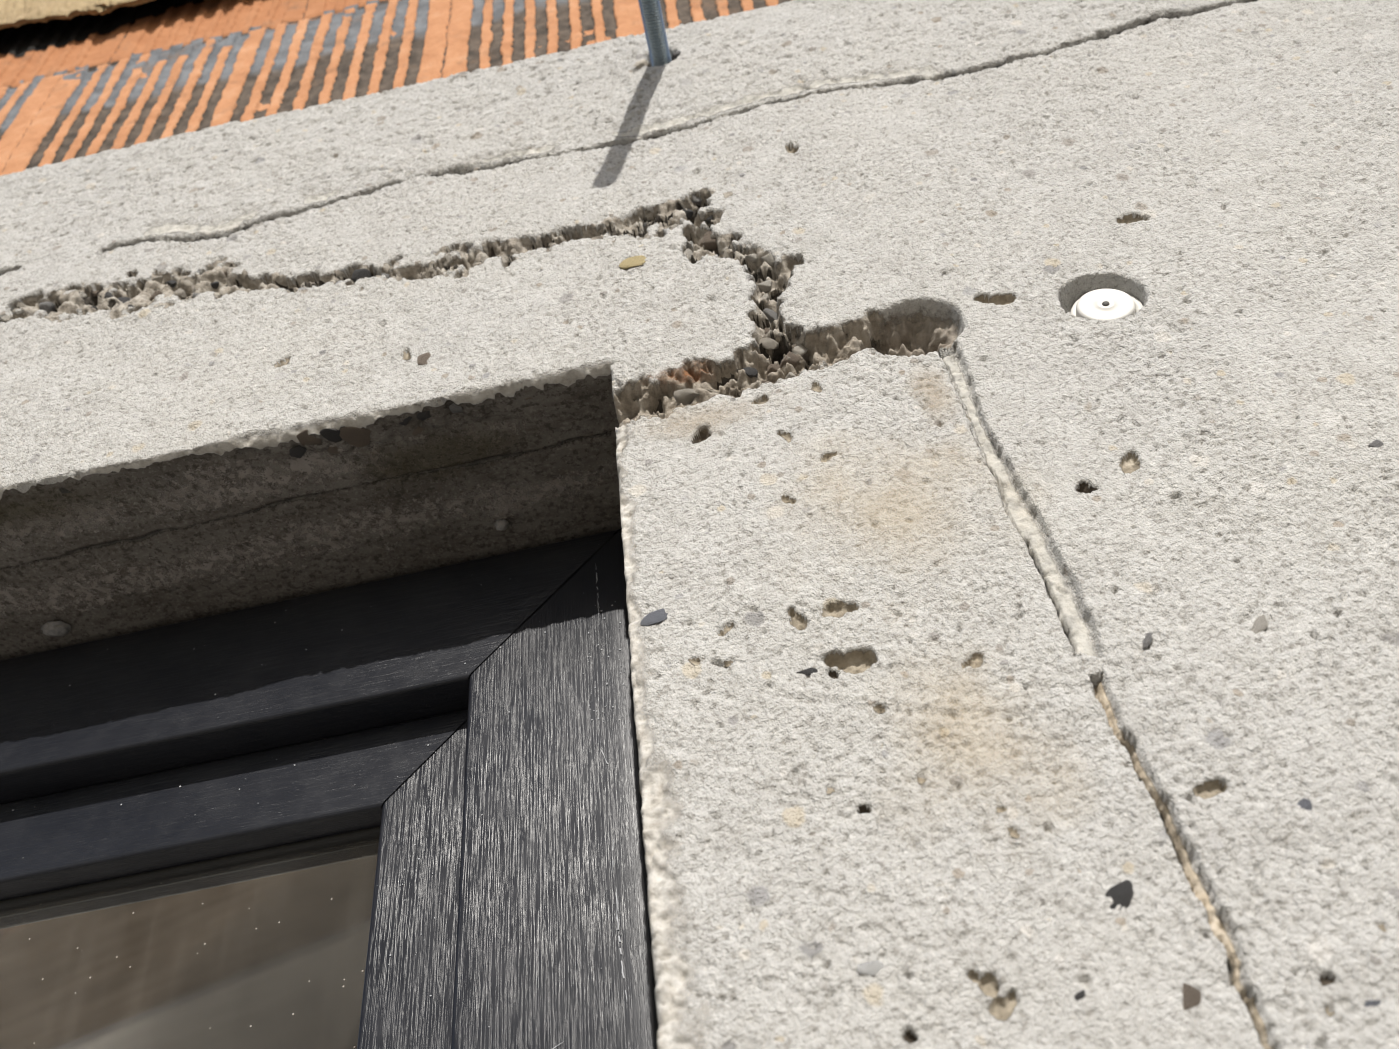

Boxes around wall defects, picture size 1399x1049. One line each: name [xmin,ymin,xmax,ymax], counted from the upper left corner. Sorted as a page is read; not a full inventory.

crack [1096,16,1179,40]
crack [601,65,999,149]
crack [303,143,560,209]
crack [125,210,275,247]
spalling [0,182,959,1049]
crack [942,354,1274,1049]